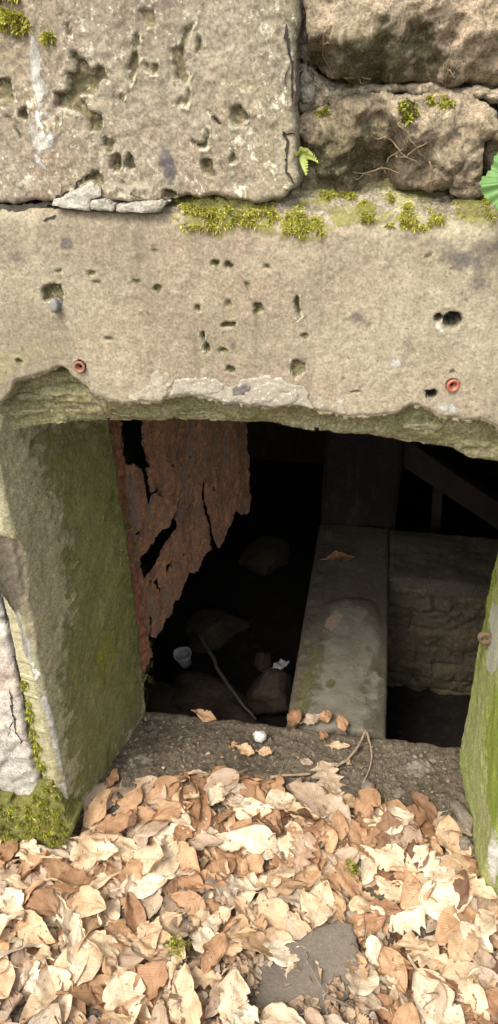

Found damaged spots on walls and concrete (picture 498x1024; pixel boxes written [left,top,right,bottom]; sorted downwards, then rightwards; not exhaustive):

spalling [0,331,498,461]
corrosion [108,417,252,673]